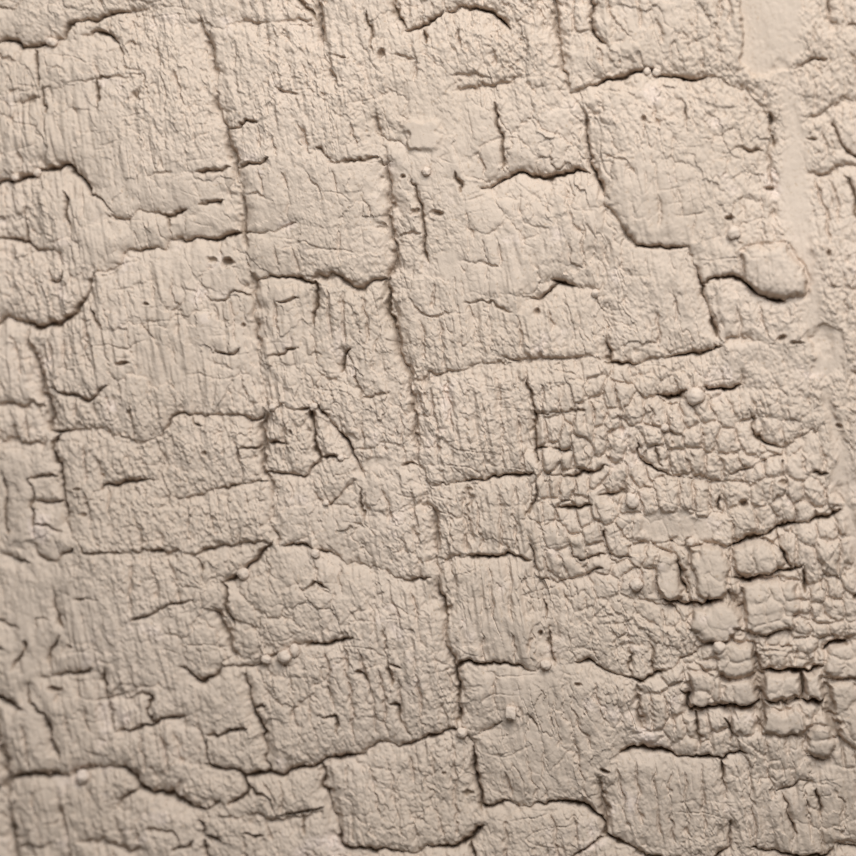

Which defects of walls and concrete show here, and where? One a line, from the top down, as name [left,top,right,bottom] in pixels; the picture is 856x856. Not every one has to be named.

crack [793,0,856,74]
crack [439,0,786,338]
crack [804,96,856,219]
crack [526,246,782,368]
crack [0,0,609,856]
crack [557,487,629,512]
crack [655,370,745,403]
crack [635,411,823,510]
crack [569,470,850,803]
crack [465,721,662,856]
crack [715,820,734,856]
crack [751,778,856,856]